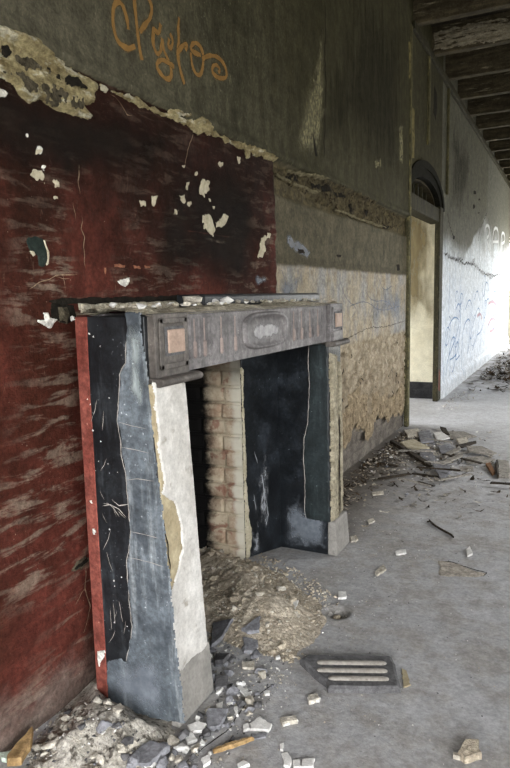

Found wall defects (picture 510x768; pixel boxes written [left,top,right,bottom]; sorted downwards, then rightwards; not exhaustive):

flaking render [0,25,402,237]
peeling [26,236,50,267]
peeling [104,264,150,287]
peeling [257,233,271,258]
crack [445,218,501,278]
peeling [97,312,274,768]